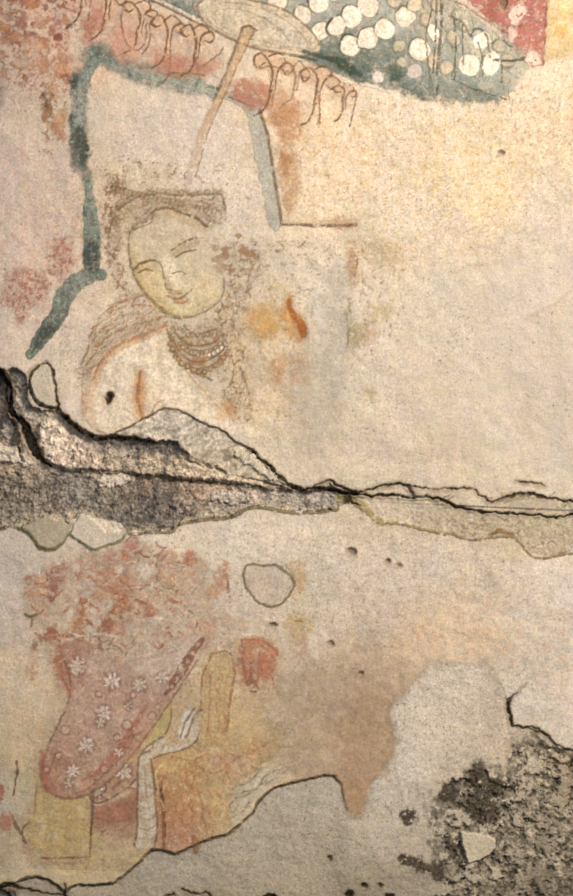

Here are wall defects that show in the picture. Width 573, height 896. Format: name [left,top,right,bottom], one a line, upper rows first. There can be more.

crack [4,363,157,467]
spalling [0,364,356,551]
peeling [434,500,573,557]
spalling [0,660,573,896]